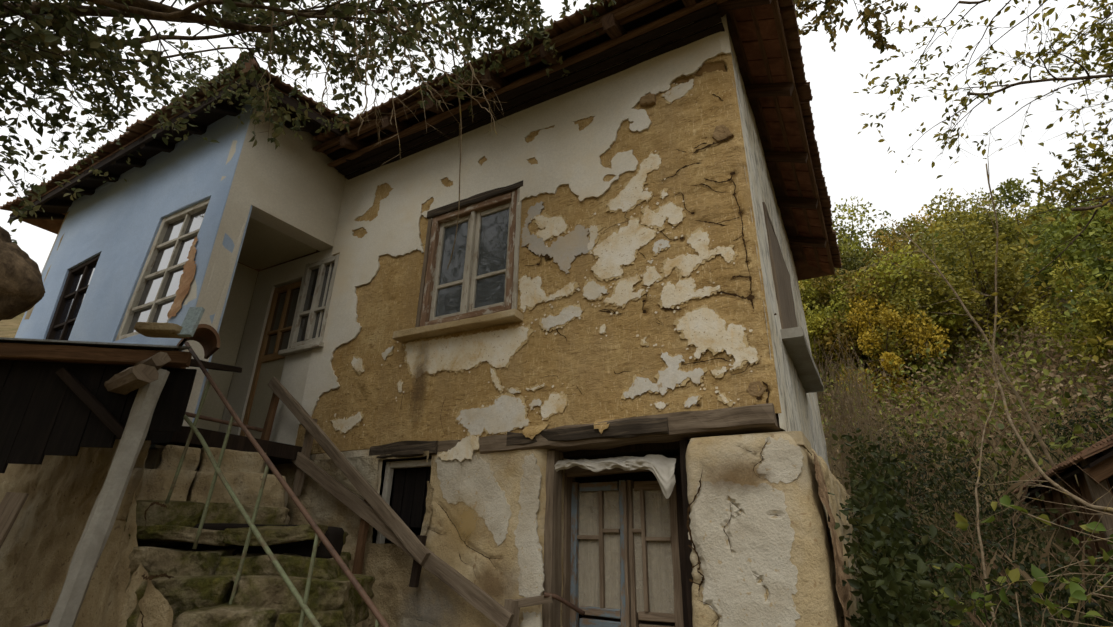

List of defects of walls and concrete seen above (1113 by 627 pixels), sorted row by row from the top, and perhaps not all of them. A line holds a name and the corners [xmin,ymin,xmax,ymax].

spalling [295,54,782,598]
crack [599,288,682,325]
crack [660,135,754,309]
peeling [688,436,853,627]
peeling [520,612,542,627]